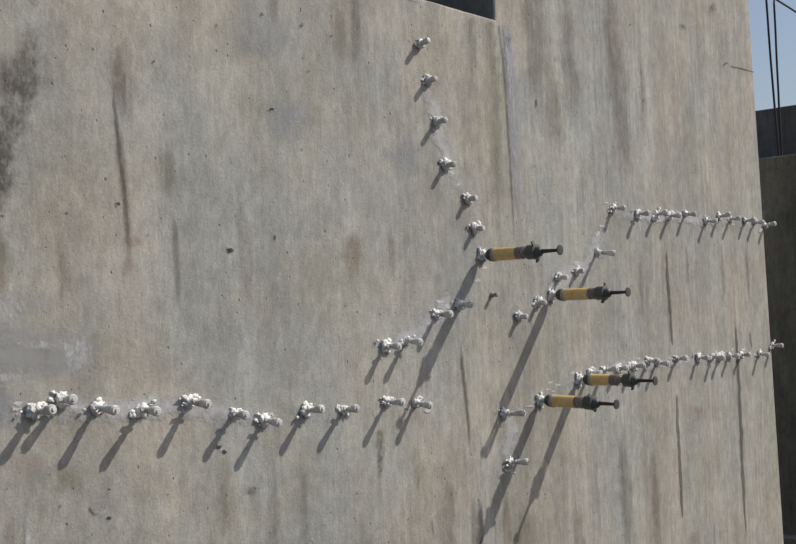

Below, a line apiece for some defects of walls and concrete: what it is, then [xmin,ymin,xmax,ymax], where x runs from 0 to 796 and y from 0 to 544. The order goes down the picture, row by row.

crack [423,88,473,193]
crack [547,202,763,301]
crack [373,292,455,354]
crack [546,348,756,392]
crack [13,401,26,419]
crack [45,391,282,426]
crack [502,405,534,474]